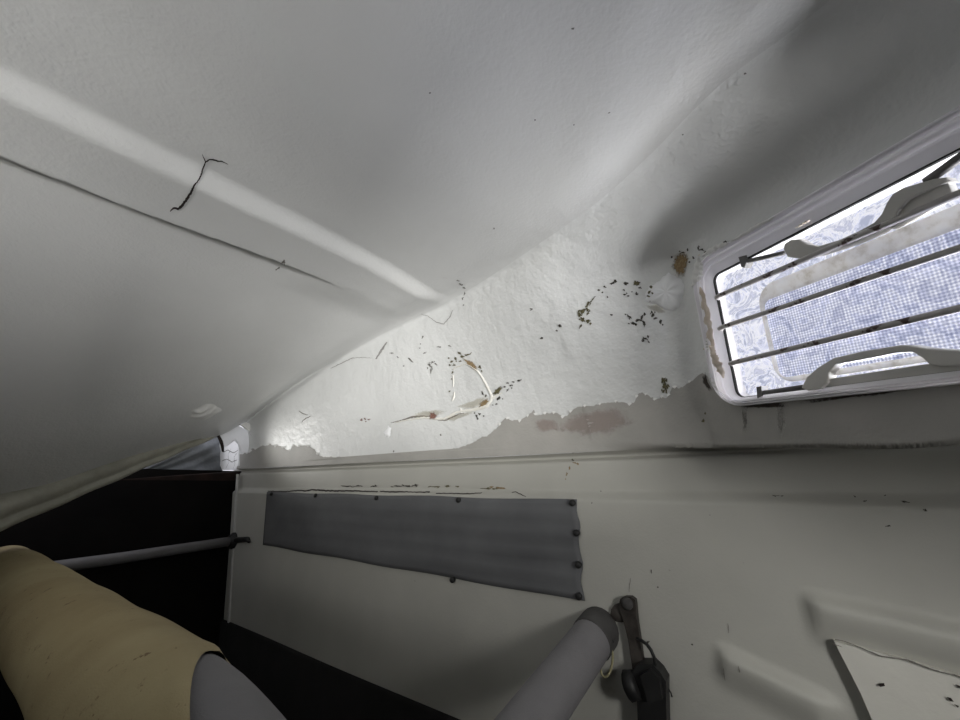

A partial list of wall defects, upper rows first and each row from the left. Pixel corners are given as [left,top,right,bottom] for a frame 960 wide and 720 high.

crack [170,154,227,212]
rust [671,248,690,275]
peeling [217,217,960,469]
leakage [578,280,642,329]
leakage [625,311,664,343]